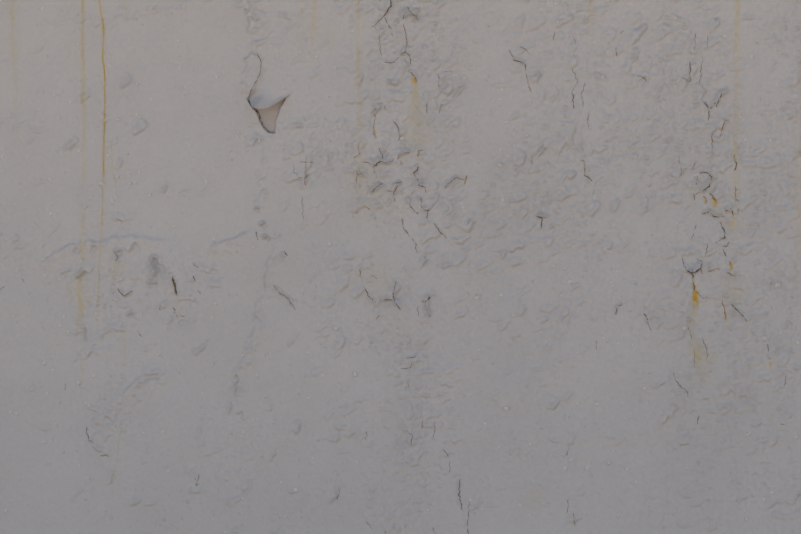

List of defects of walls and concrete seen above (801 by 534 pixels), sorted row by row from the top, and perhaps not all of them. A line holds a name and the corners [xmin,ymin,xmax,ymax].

crack [373,0,448,86]
peeling [247,50,299,133]
crack [702,93,727,150]
crack [354,106,467,253]
crack [679,155,750,322]